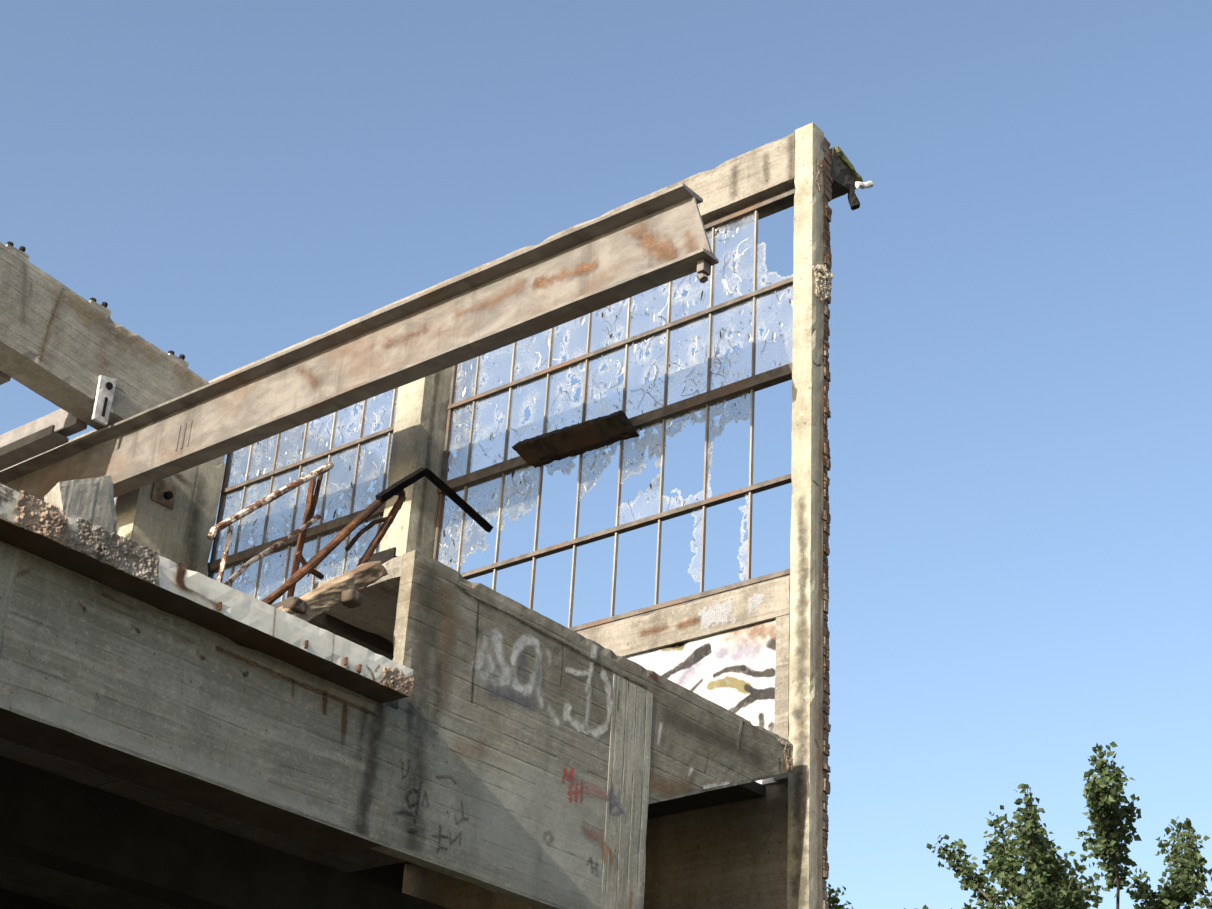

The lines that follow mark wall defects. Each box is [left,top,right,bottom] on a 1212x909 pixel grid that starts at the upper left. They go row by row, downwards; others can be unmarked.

spalling [812,265,834,302]
spalling [0,482,160,587]
rust [176,563,219,608]
rust [216,646,376,736]